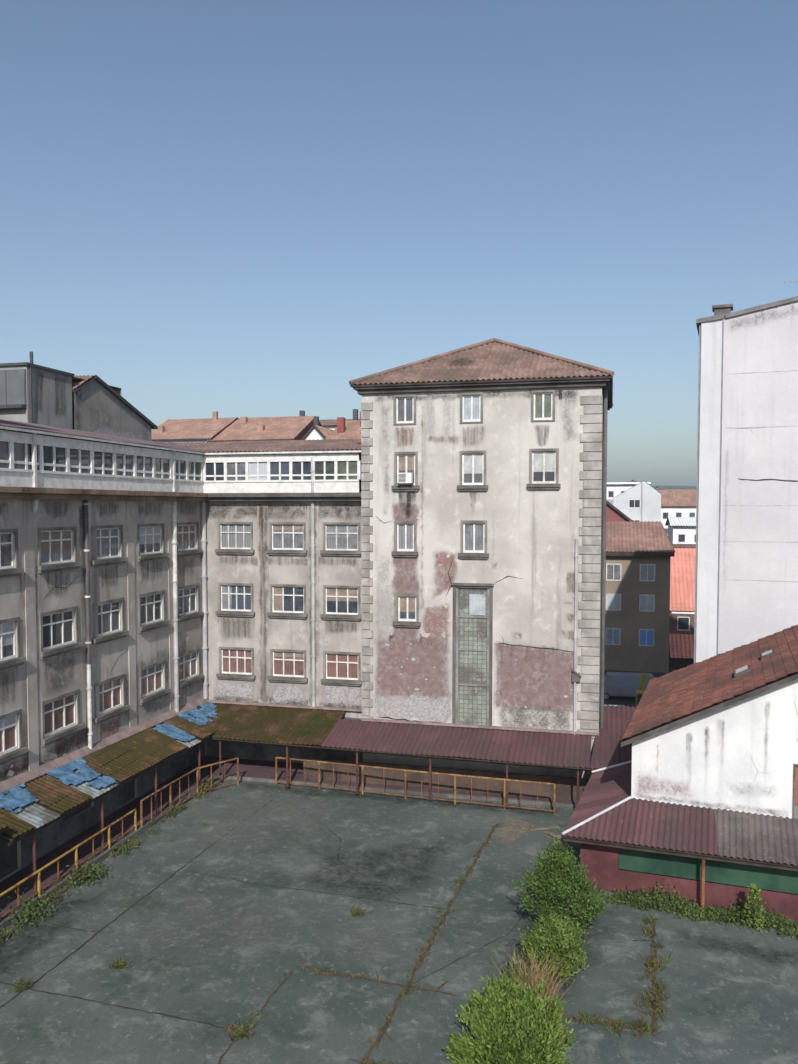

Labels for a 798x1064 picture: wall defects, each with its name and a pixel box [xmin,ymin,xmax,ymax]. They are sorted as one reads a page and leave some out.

peeling [394,504,421,521]
crack [738,476,798,484]
peeling [373,552,456,699]
peeling [495,644,574,711]
crack [0,800,529,1064]